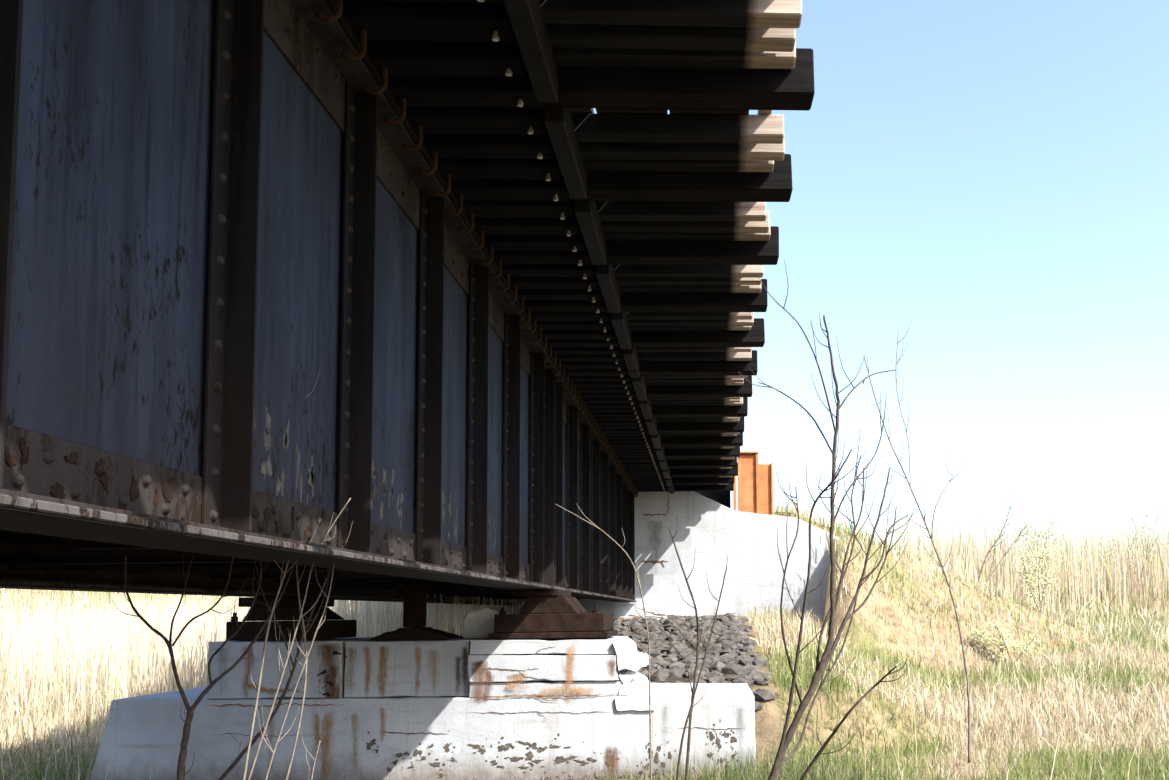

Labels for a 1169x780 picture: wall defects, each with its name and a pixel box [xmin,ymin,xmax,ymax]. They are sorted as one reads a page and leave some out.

rust [4,437,30,467]
peeling [254,407,314,503]
rust [49,481,67,499]
rust [117,476,140,510]
rust [153,476,177,511]
rust [321,644,339,699]
rust [366,646,386,693]
rust [456,648,492,700]
rust [542,647,592,699]
spalling [613,640,655,711]
rust [315,715,331,775]
peeling [366,730,676,780]